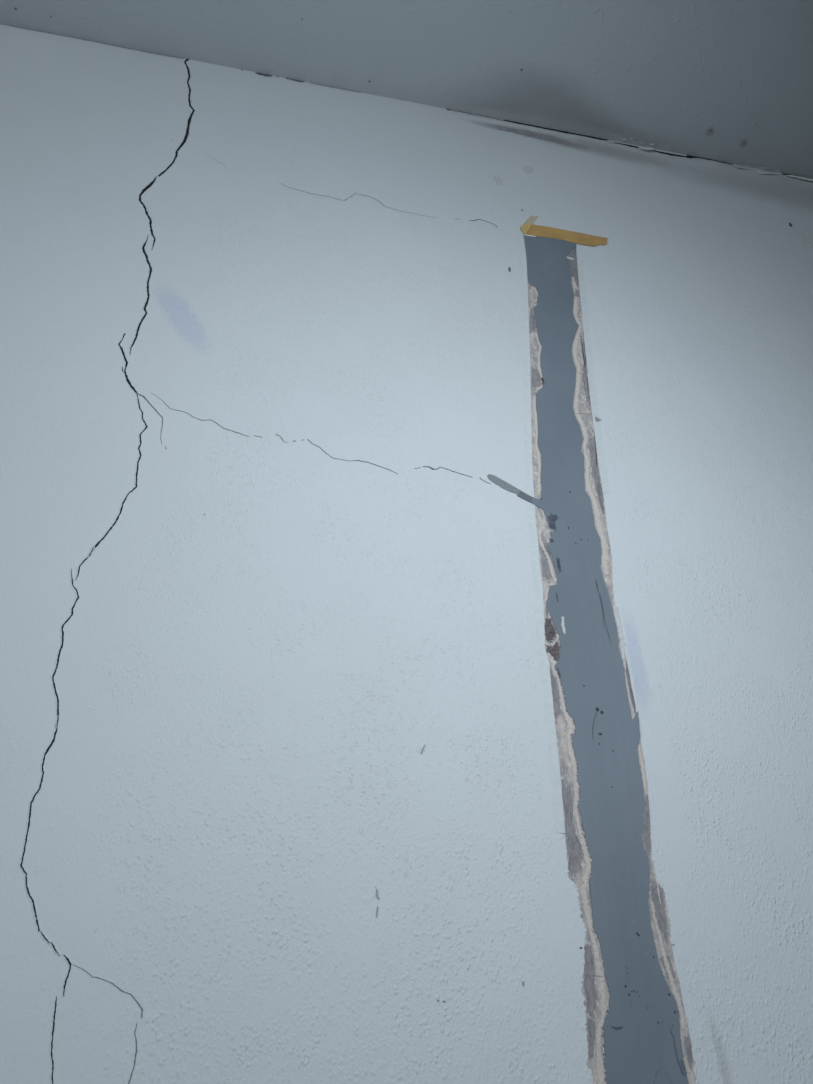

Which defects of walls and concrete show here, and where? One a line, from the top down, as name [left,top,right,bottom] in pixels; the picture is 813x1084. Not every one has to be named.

crack [446,109,813,183]
crack [0,23,491,1084]
peeling [508,233,610,1084]
peeling [566,247,636,719]
peeling [637,738,696,1084]